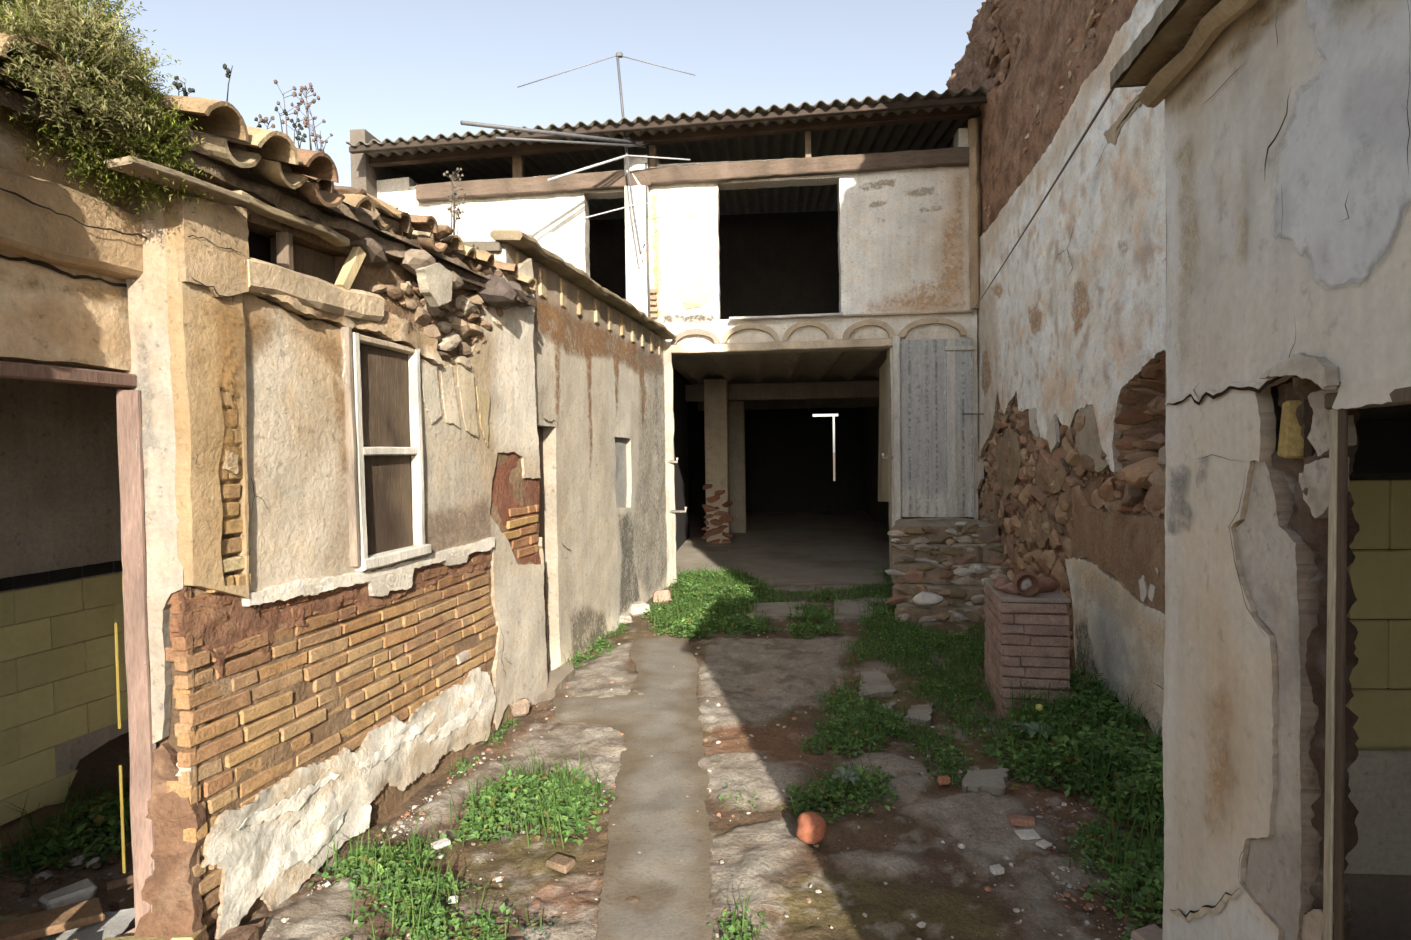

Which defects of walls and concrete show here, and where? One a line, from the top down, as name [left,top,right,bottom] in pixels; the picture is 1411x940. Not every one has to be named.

crack [0,254,127,287]
crack [0,188,148,240]
spalling [348,237,528,447]
crack [1165,316,1296,406]
crack [1265,89,1291,233]
peeling [1274,0,1411,287]
crack [1403,0,1411,184]
flaking render [491,452,541,565]
flaking render [900,339,1166,658]
flaking render [103,356,498,940]
flaking render [1271,377,1360,940]
spalling [0,898,105,940]